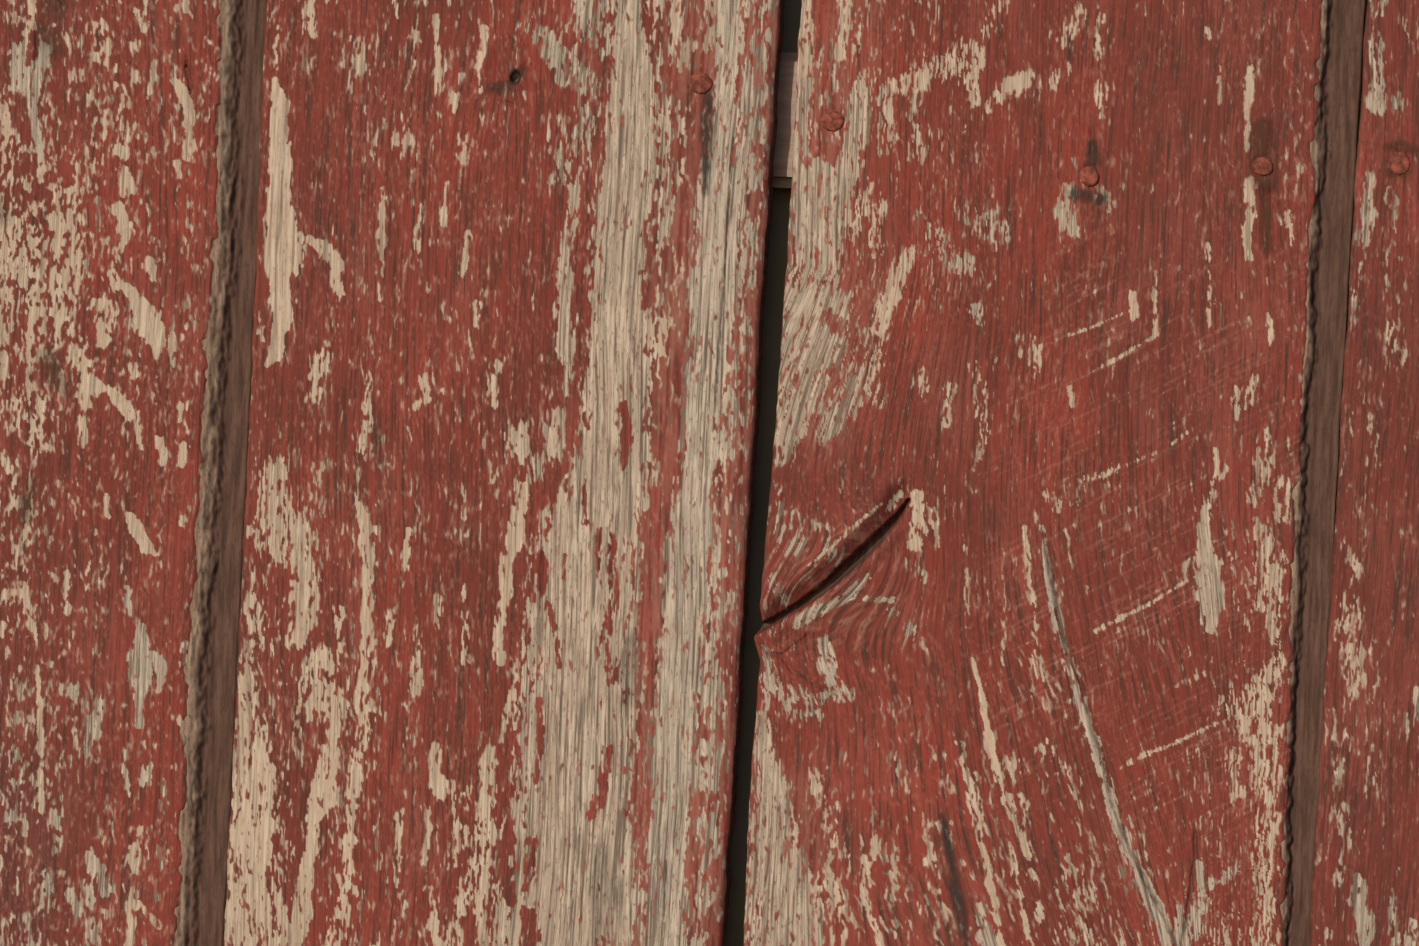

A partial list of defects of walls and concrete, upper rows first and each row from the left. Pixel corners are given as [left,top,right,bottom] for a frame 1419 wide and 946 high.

peeling [0,665,161,946]
peeling [0,0,197,658]
peeling [125,586,189,728]
peeling [257,25,345,367]
peeling [224,456,397,946]
peeling [421,0,779,946]
peeling [744,635,900,946]
crack [755,499,910,697]
peeling [768,0,1108,583]
peeling [931,741,1005,946]
peeling [971,658,1044,946]
crack [1042,528,1198,946]